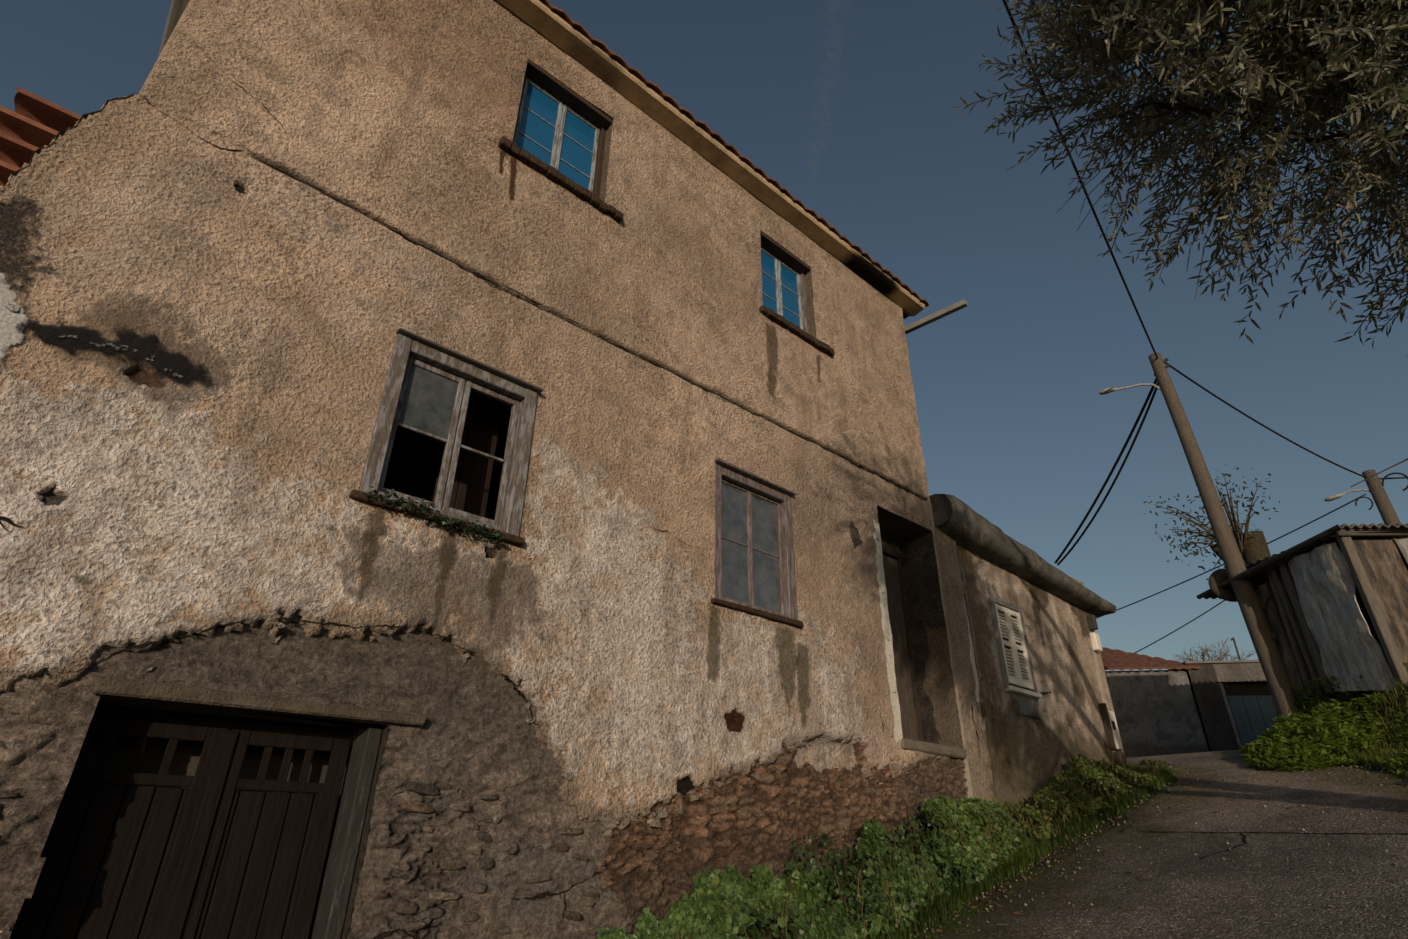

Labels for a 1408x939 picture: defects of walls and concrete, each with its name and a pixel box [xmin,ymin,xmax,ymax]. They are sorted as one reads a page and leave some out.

corrosion [499,151,517,200]
leakage [0,196,56,308]
crack [141,42,923,498]
crack [0,516,23,533]
flaking render [0,519,968,939]
leakage [707,606,720,680]
leakage [777,628,810,723]
peeling [959,564,987,731]